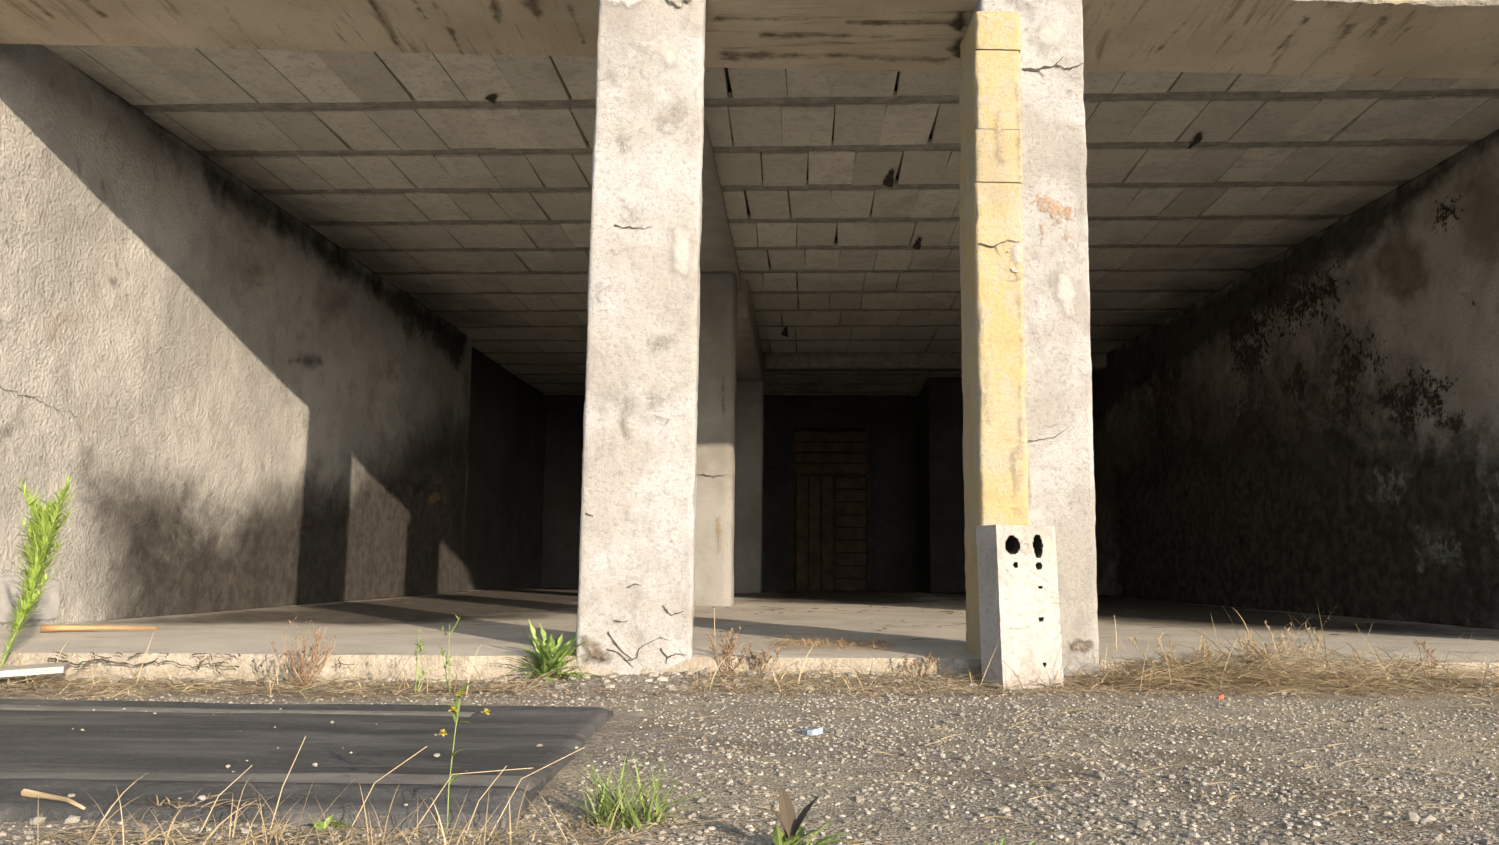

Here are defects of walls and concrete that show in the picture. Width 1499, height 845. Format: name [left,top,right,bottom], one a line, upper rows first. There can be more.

leakage [723,19,904,59]
crack [1022,56,1084,77]
corrosion [1029,193,1073,246]
crack [0,386,76,417]
leakage [1092,251,1465,576]
crack [607,583,685,667]
crack [45,652,267,674]